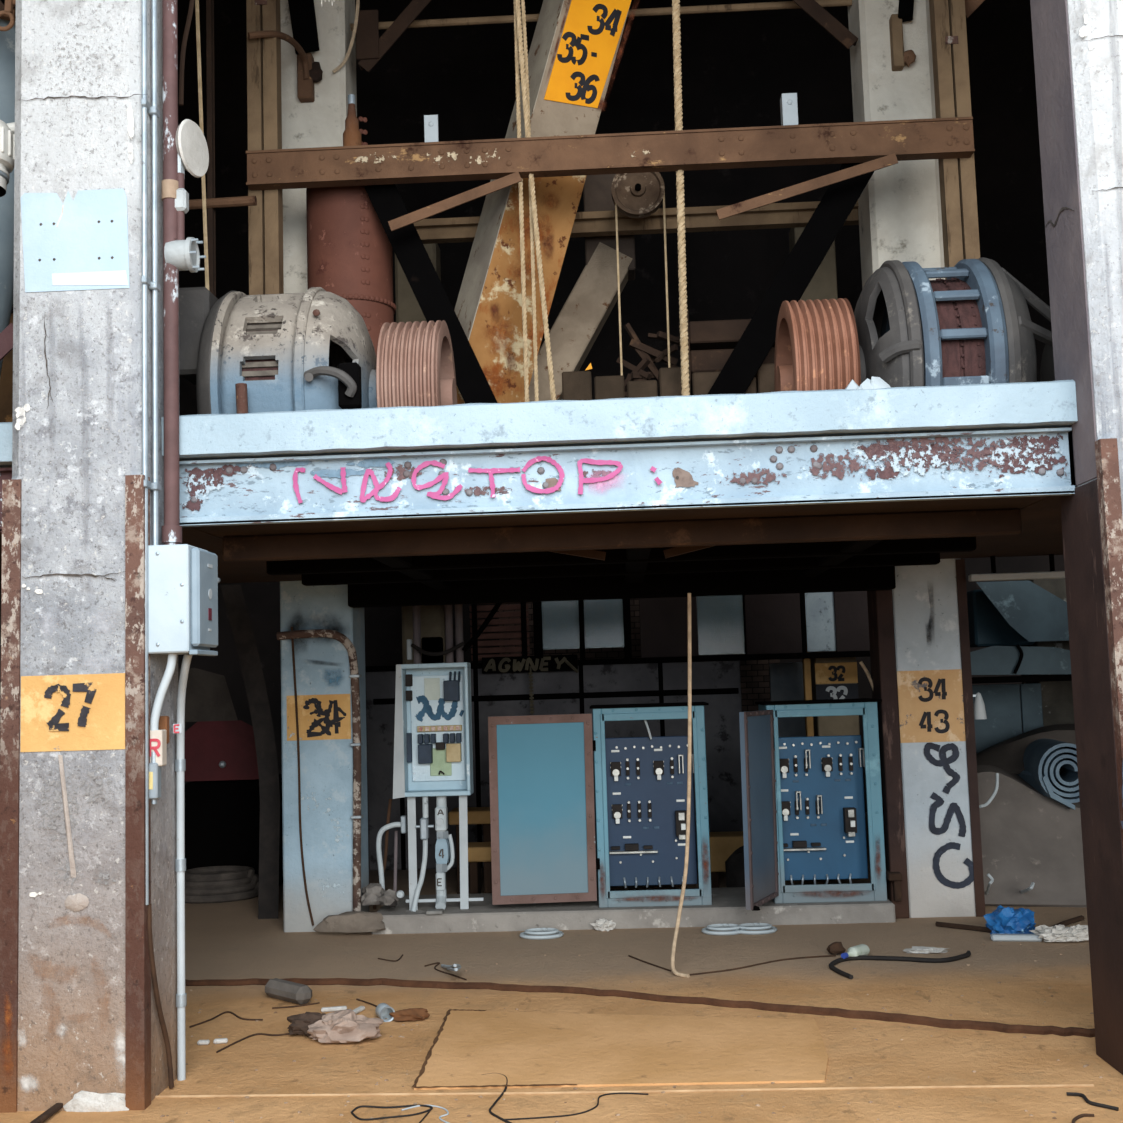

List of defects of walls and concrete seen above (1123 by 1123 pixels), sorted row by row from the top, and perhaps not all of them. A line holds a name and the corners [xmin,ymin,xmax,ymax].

crack [24,93,147,101]
crack [1045,207,1074,227]
peeling [800,431,1069,481]
peeling [181,458,422,511]
peeling [454,486,512,496]
peeling [583,469,614,484]
peeling [720,468,787,486]
crack [23,571,125,582]